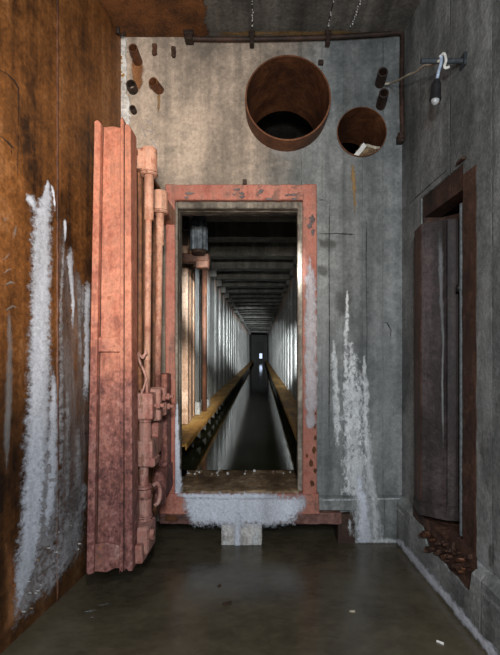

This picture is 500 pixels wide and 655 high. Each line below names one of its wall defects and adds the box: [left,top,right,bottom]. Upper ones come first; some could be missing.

corrosion [132,61,143,89]
leakage [13,180,90,620]
leakage [175,404,306,546]
peeling [304,258,318,473]
leakage [331,291,396,543]
corrosion [5,544,34,628]
corrosion [95,541,119,572]
spalling [418,528,478,590]